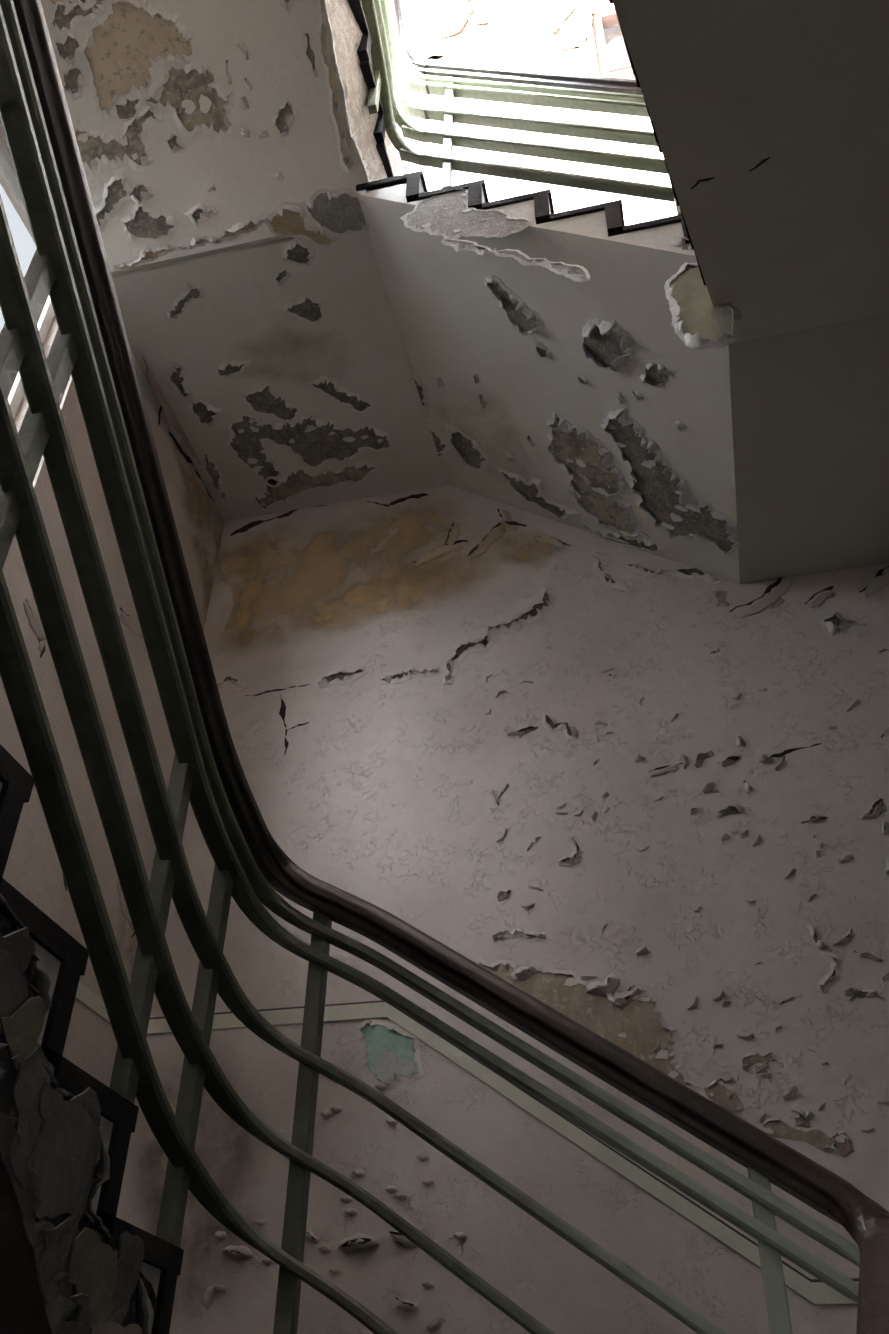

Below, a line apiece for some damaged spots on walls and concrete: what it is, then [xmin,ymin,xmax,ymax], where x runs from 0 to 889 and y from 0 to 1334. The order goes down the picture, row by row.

peeling [403,0,595,75]
peeling [42,0,408,287]
peeling [400,188,591,283]
peeling [482,274,553,360]
peeling [664,236,742,350]
peeling [167,360,394,512]
peeling [411,319,740,607]
peeling [314,584,557,689]
peeling [507,712,578,741]
peeling [476,958,777,1112]
peeling [0,894,149,1334]
peeling [760,1083,875,1157]